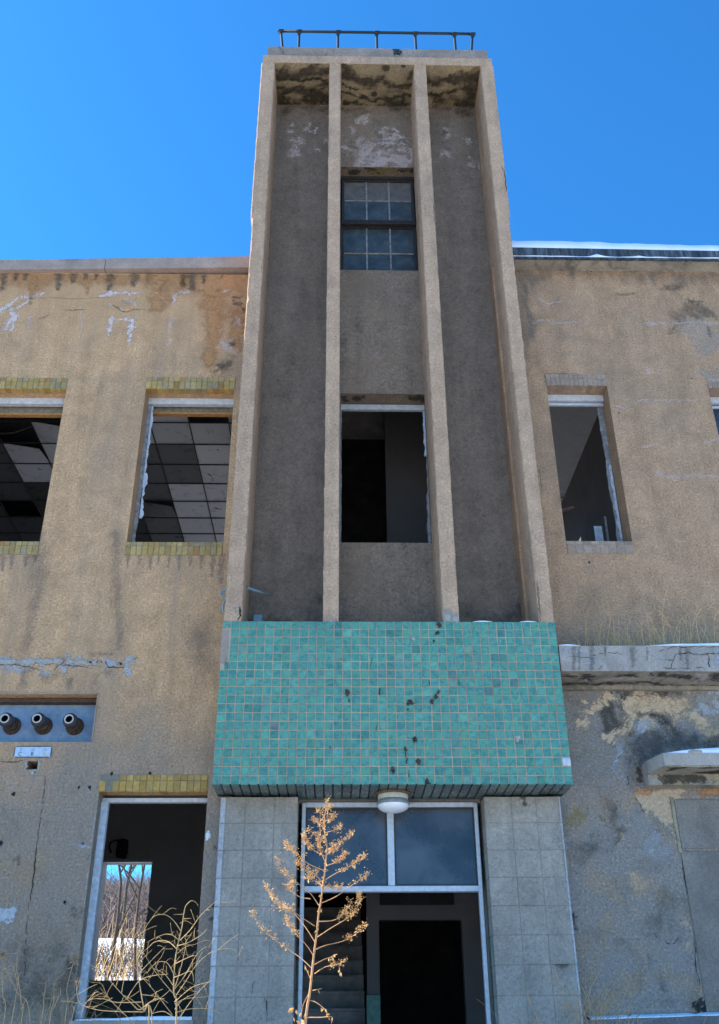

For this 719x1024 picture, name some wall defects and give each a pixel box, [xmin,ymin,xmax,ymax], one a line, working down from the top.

water stain [276,63,414,175]
water stain [427,70,480,116]
water stain [0,273,244,344]
spalling [0,656,135,668]
crack [661,646,719,669]
water stain [562,647,719,781]
peeling [575,691,719,746]
peeling [633,767,719,844]